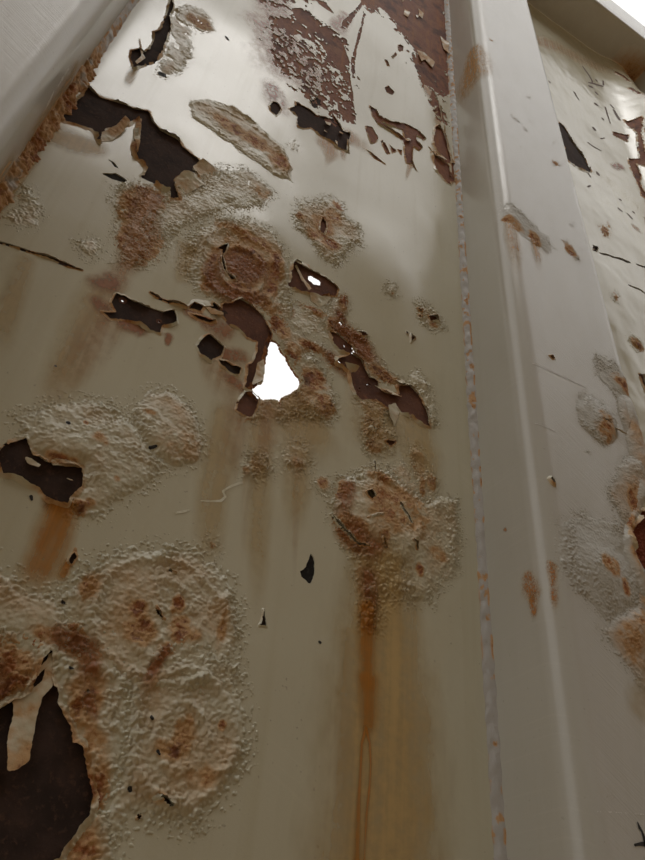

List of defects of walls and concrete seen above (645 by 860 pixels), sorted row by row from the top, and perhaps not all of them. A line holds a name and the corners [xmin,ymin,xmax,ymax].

rust [50,131,102,153]
peeling [61,85,219,201]
peeling [258,0,455,186]
peeling [558,121,593,173]
peeling [99,292,273,419]
peeling [288,259,340,307]
peeling [327,327,432,430]
peeling [416,307,441,325]
peeling [0,434,88,508]
peeling [628,504,645,569]
peeling [0,644,100,860]
rust [355,569,377,860]